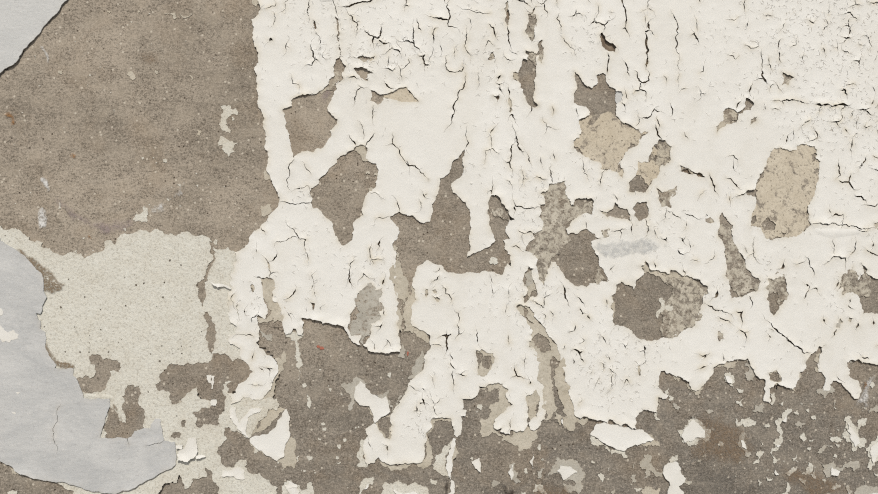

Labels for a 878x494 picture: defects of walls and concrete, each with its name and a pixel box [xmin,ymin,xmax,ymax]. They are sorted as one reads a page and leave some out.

peeling [0,0,280,306]
peeling [574,73,648,177]
crack [232,0,878,459]
peeling [0,326,19,342]
peeling [75,329,121,394]
peeling [103,385,149,438]
peeling [156,137,878,494]
peeling [0,462,74,494]